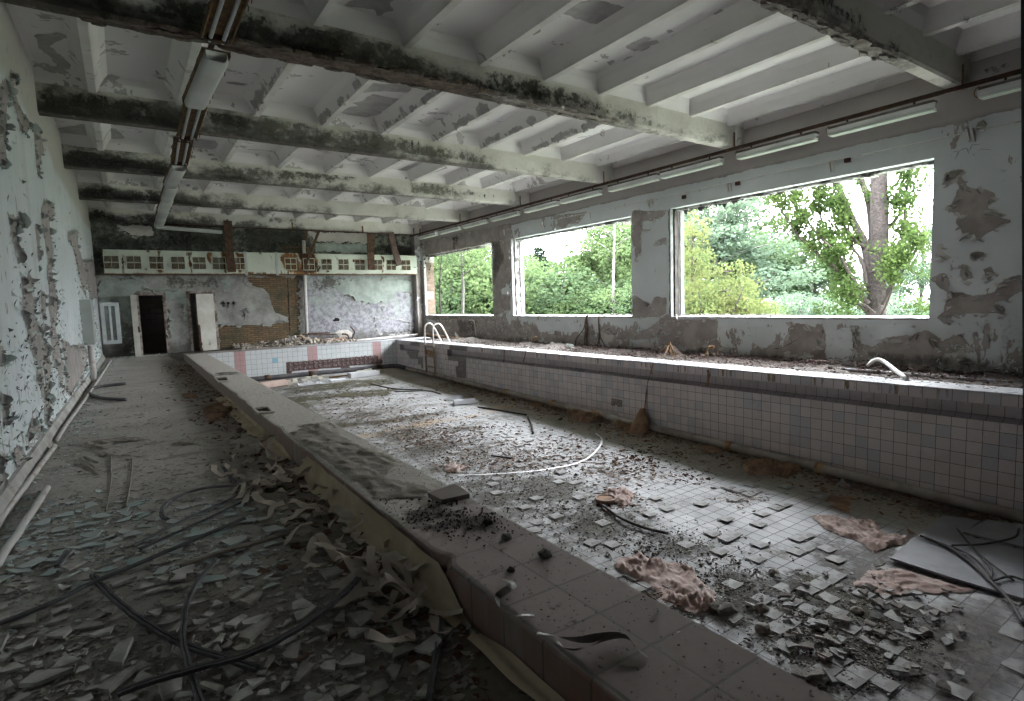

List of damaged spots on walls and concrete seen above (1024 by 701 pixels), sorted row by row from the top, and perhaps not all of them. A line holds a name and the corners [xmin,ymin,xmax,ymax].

mould [236,16,434,72]
peeling [0,68,48,179]
spalling [75,12,620,151]
leakage [341,83,411,117]
mould [450,72,651,125]
mould [65,151,168,171]
mould [221,166,353,183]
peeling [0,198,189,490]
mould [95,225,224,252]
flaking render [218,275,304,348]
peeling [335,223,736,378]
peeling [749,169,1022,373]